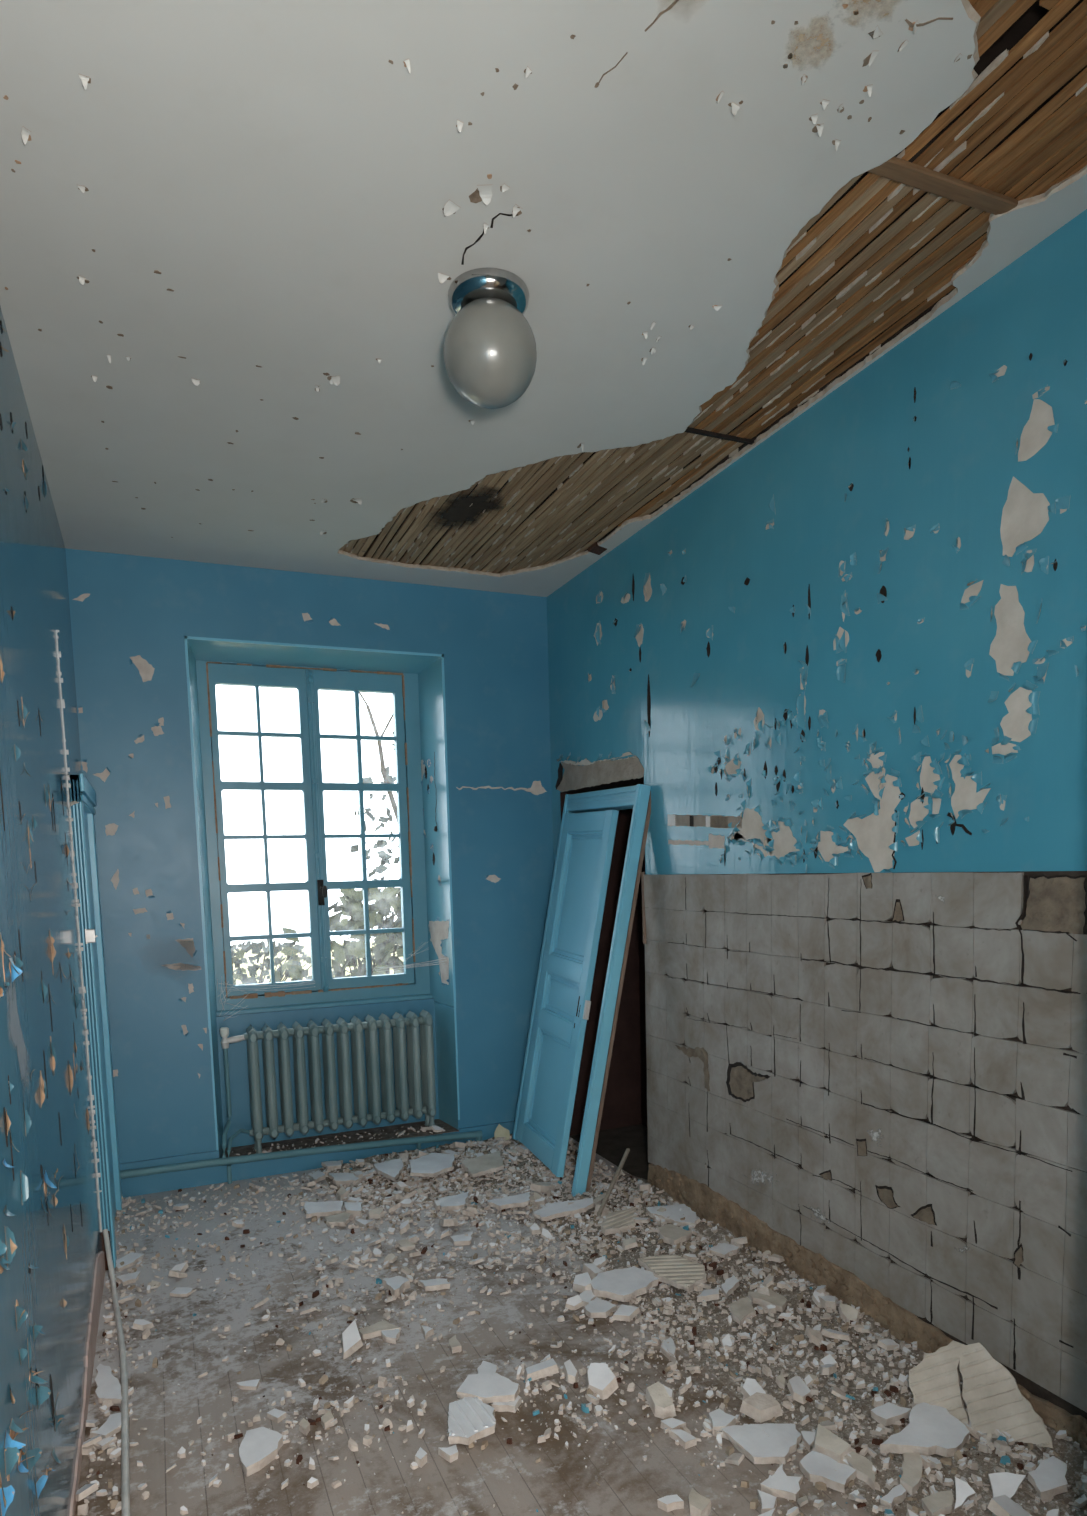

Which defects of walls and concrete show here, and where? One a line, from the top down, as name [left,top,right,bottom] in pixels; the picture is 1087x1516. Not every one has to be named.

crack [597,0,679,87]
peeling [442,174,531,232]
water stain [435,489,501,527]
peeling [128,655,155,682]
peeling [593,622,651,737]
peeling [708,384,1086,889]
spalling [555,752,644,792]
spalling [1016,874,1087,934]
peeling [0,630,111,1274]
peeling [428,917,450,986]
spalling [675,1045,770,1102]
peeling [0,1251,105,1516]